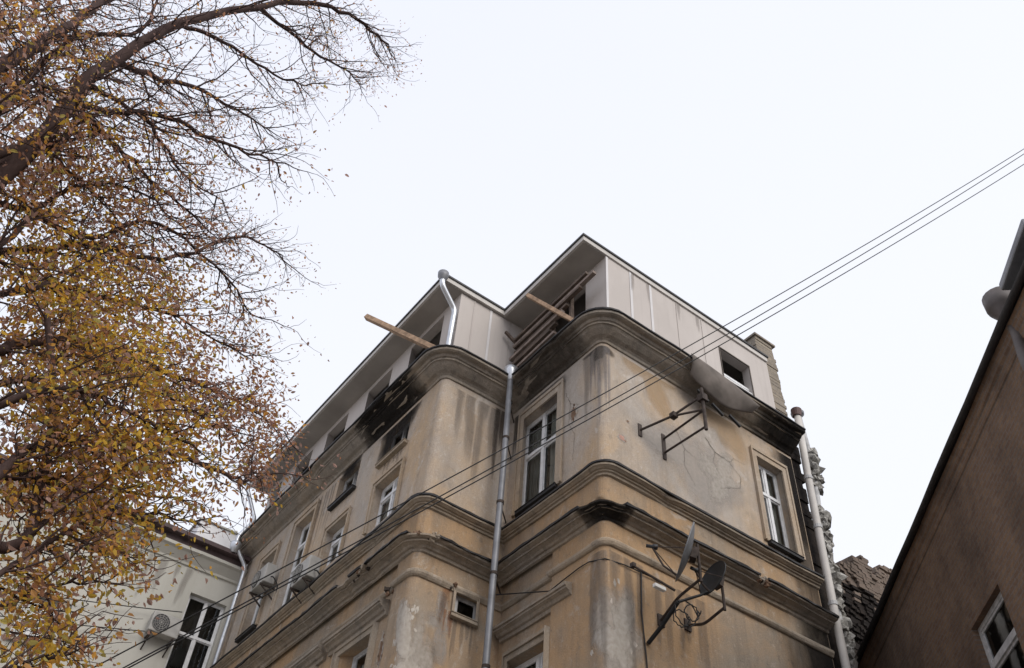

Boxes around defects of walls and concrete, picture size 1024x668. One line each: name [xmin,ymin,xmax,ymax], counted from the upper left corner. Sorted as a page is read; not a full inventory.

damp [494,408,519,452]
damp [577,499,634,527]